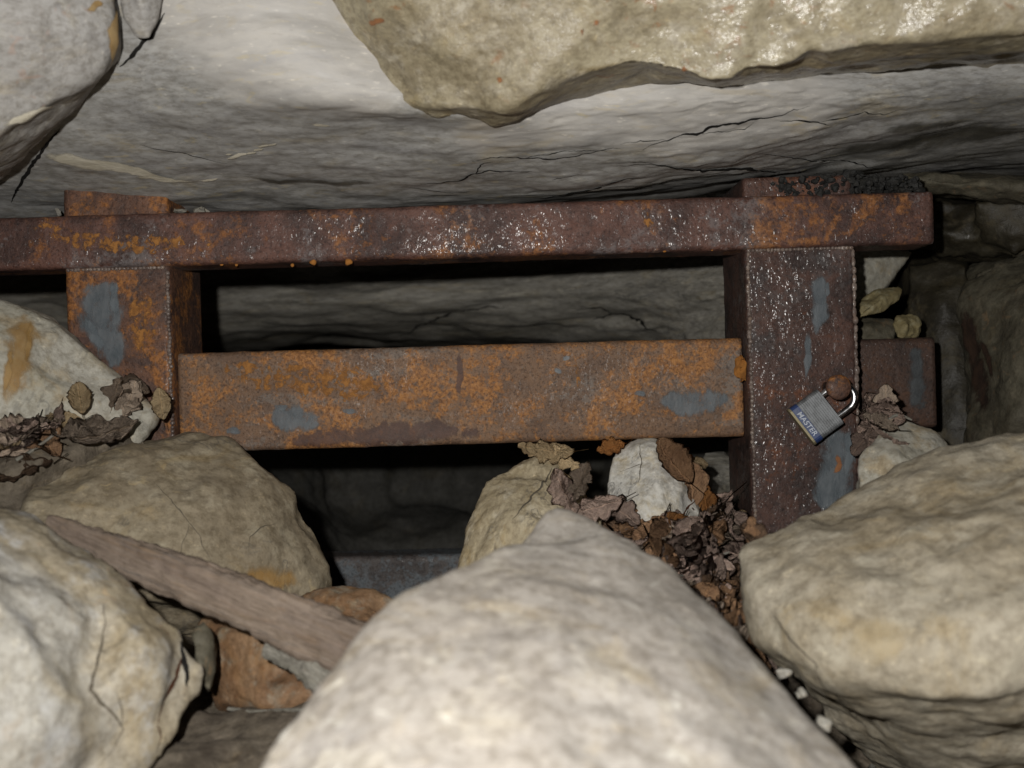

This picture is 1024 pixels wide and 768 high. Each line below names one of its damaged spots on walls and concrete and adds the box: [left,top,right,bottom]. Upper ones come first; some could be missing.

rust [36,219,185,254]
rust [224,360,388,402]
rust [734,355,747,382]
rust [293,419,479,447]